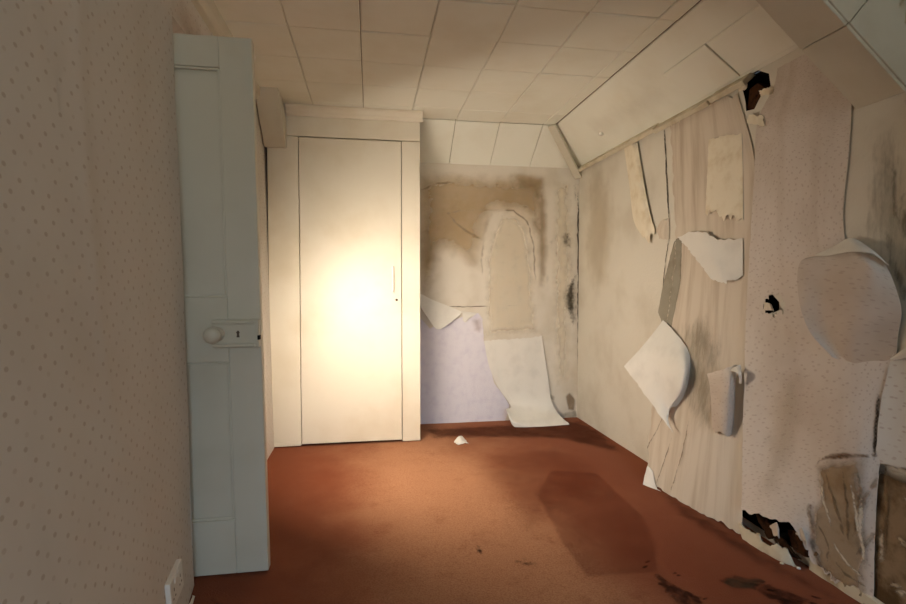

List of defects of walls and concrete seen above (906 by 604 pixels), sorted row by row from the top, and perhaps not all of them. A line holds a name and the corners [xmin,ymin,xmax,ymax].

spalling [738,71,774,126]
flaking render [658,238,682,327]
spalling [738,510,818,570]